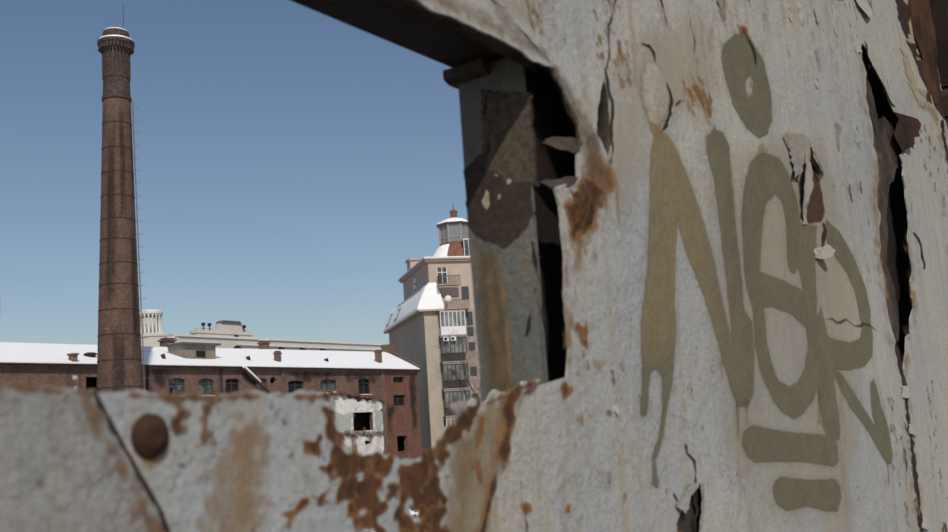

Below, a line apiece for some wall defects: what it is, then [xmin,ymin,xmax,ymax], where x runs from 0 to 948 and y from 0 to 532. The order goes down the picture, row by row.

crack [606,0,656,68]
corrosion [683,75,712,124]
peeling [463,154,533,249]
corrosion [564,153,619,261]
peeling [783,132,836,259]
crack [831,318,873,328]
corrosion [284,255,537,532]
crack [893,340,947,532]